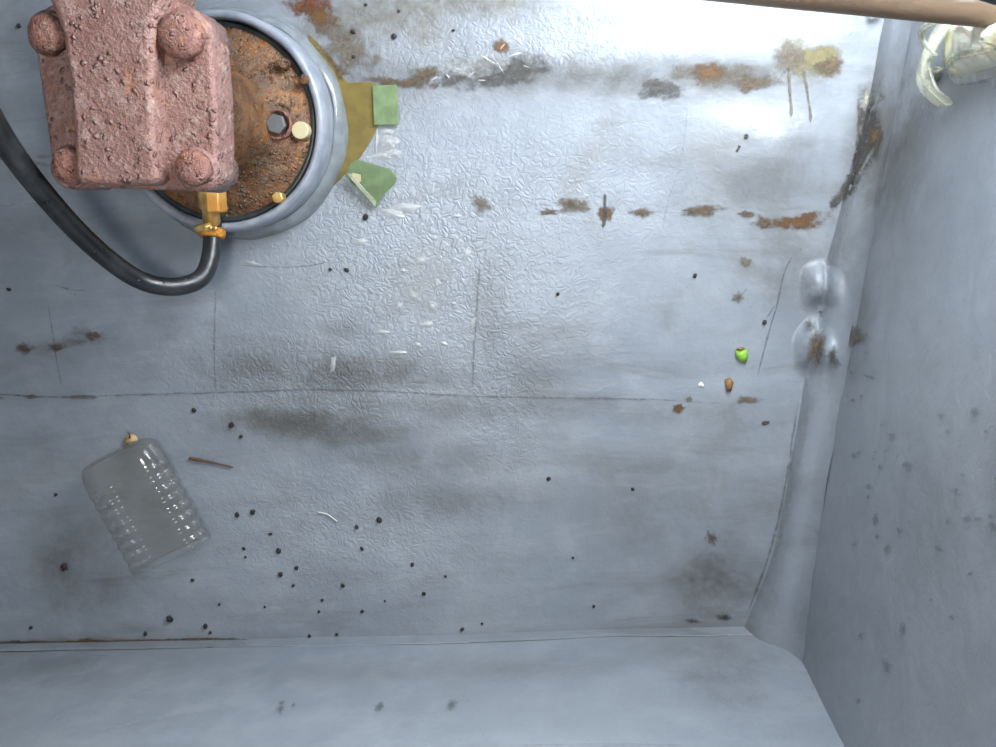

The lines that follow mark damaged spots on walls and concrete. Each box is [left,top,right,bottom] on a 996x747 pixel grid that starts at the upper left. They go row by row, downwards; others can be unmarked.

water stain [318,28,380,67]
rust [640,63,767,99]
rust [830,91,883,207]
rust [475,197,491,212]
rust [541,194,614,227]
rust [684,205,716,216]
rust [738,211,819,229]